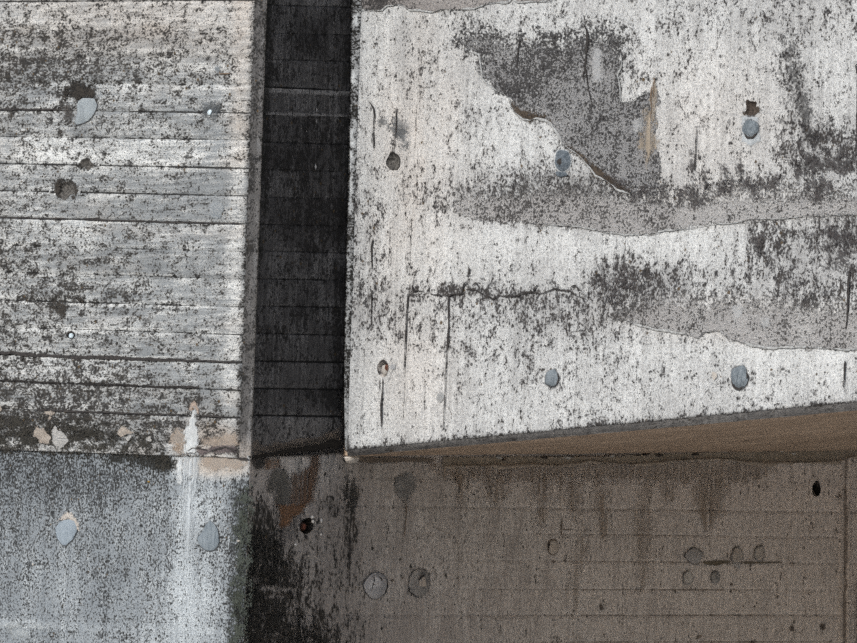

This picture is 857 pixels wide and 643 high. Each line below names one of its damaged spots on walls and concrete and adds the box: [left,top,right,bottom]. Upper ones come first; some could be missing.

spalling [361,0,857,236]
spalling [598,281,857,352]
peeling [33,411,68,449]
peeling [118,426,134,441]
corrosion [276,454,319,544]
water stain [234,531,342,643]